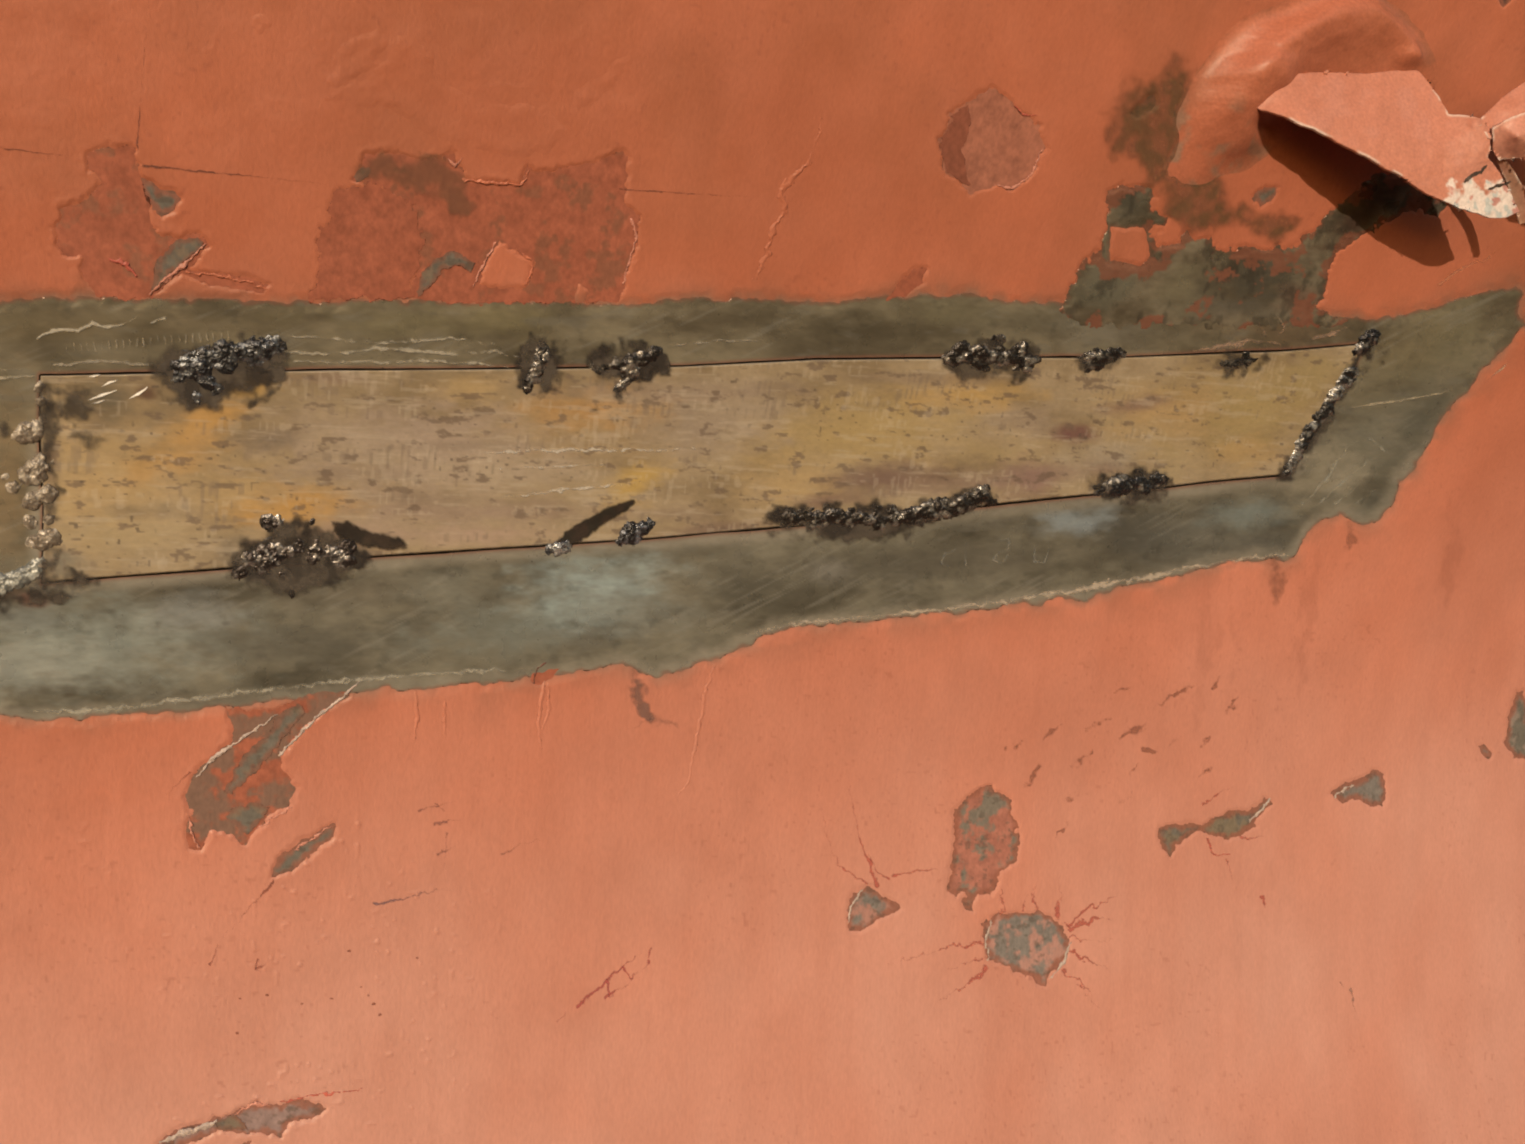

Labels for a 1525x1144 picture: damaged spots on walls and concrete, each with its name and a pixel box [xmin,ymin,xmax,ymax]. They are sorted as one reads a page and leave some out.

peeling [55,145,268,301]
peeling [352,151,640,306]
crack [752,116,823,284]
peeling [185,677,364,850]
peeling [272,823,336,877]
peeling [847,886,901,931]
peeling [947,785,1072,986]
crack [939,898,1102,991]
peeling [1158,797,1273,857]
peeling [1331,770,1386,807]
peeling [1478,691,1525,759]
peeling [158,1088,362,1144]